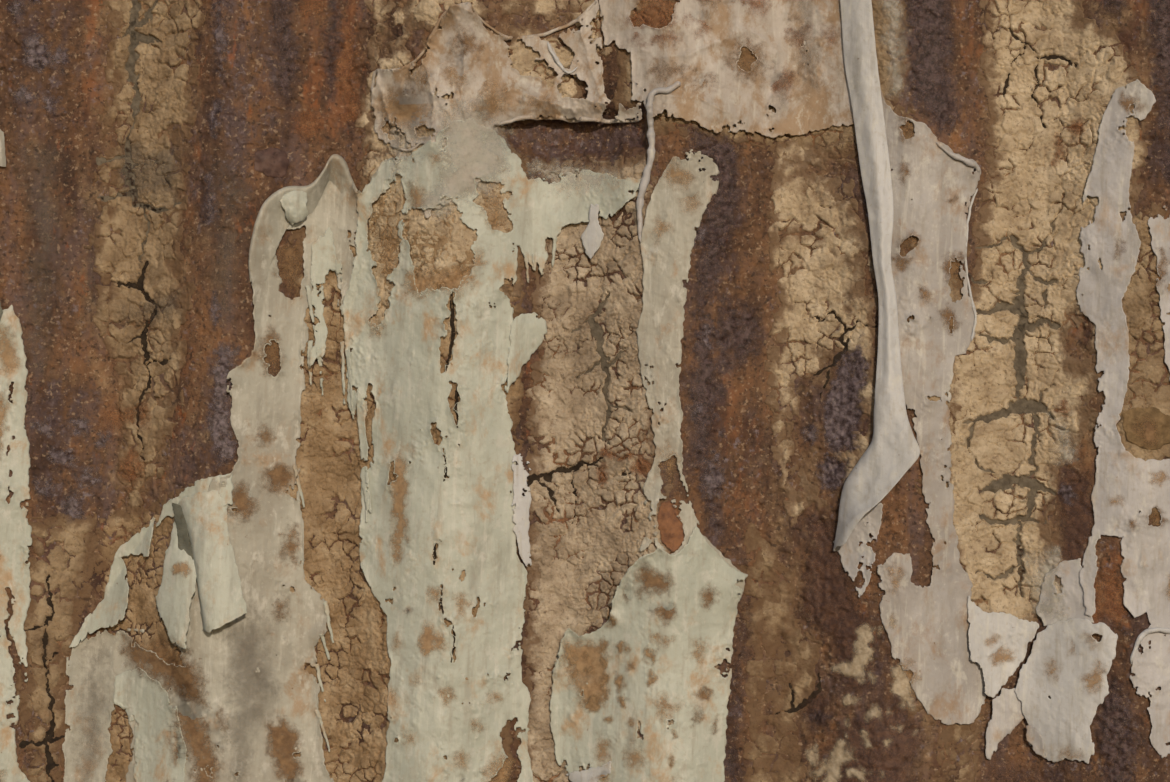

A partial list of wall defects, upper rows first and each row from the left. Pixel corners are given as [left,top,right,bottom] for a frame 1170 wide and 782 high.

crack [1002,27,1077,128]
crack [96,0,182,461]
peeling [0,0,823,782]
crack [527,291,632,524]
corrosion [667,129,760,538]
peeling [594,0,1170,764]
crack [963,211,1061,597]
corrosion [1058,468,1093,560]
corrosion [121,635,204,703]
peeling [813,736,853,782]
peeling [847,768,865,780]
corrosion [820,697,922,782]